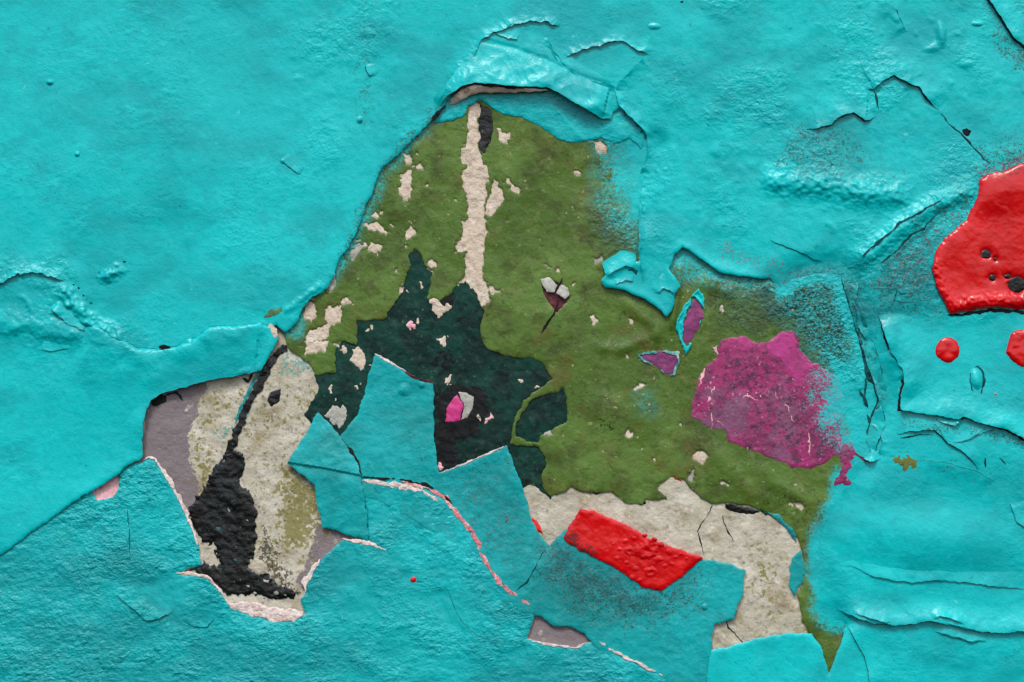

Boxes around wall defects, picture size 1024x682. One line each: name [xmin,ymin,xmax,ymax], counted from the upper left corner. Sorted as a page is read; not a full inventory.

crack [807,0,990,163]
peeling [61,31,899,682]
crack [771,227,1006,496]